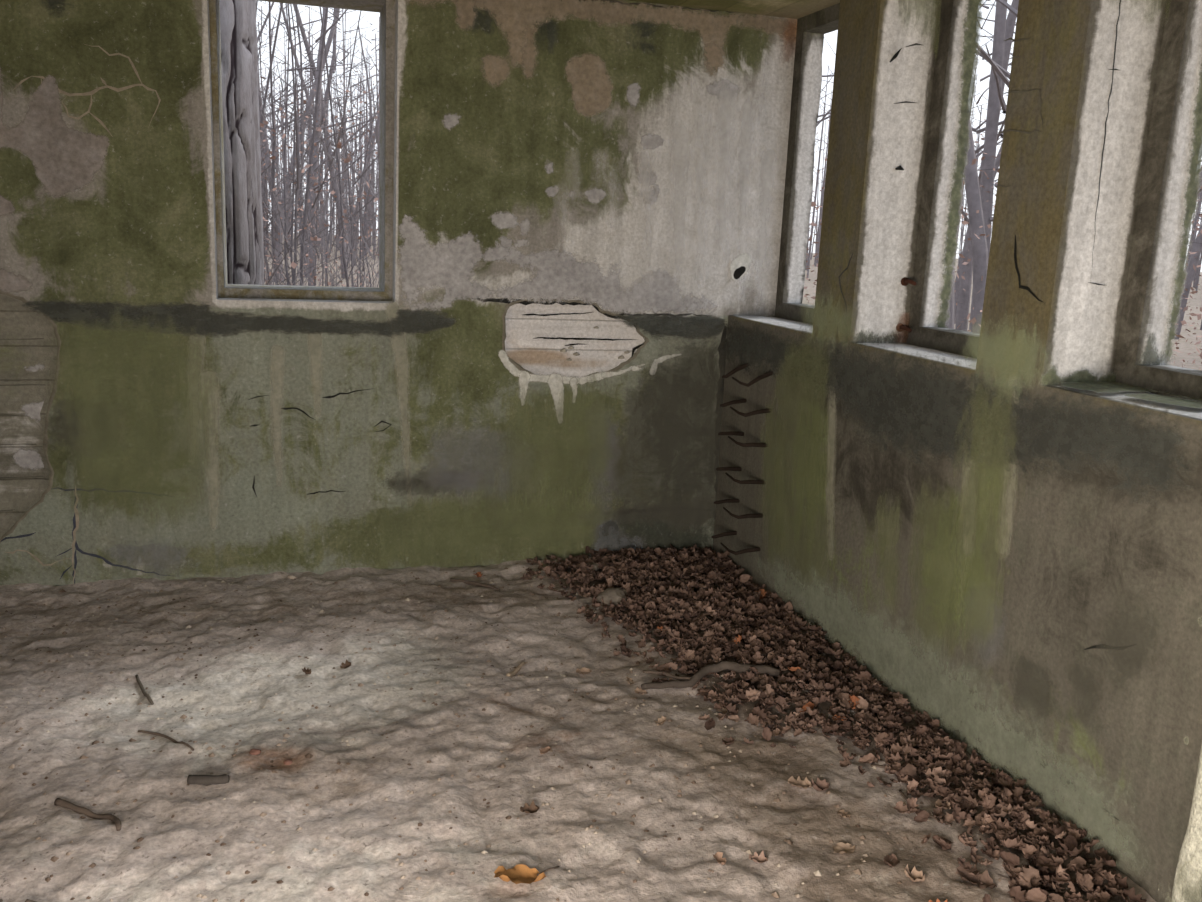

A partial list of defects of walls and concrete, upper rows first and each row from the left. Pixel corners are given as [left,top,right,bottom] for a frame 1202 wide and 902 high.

peeling [0,67,110,198]
peeling [443,114,460,130]
peeling [545,163,606,203]
peeling [565,54,640,116]
crack [1088,0,1121,285]
peeling [397,212,717,378]
crack [1014,235,1042,302]
spalling [0,269,61,543]
crack [249,388,375,426]
damp [499,315,1190,558]
crack [1,486,173,584]